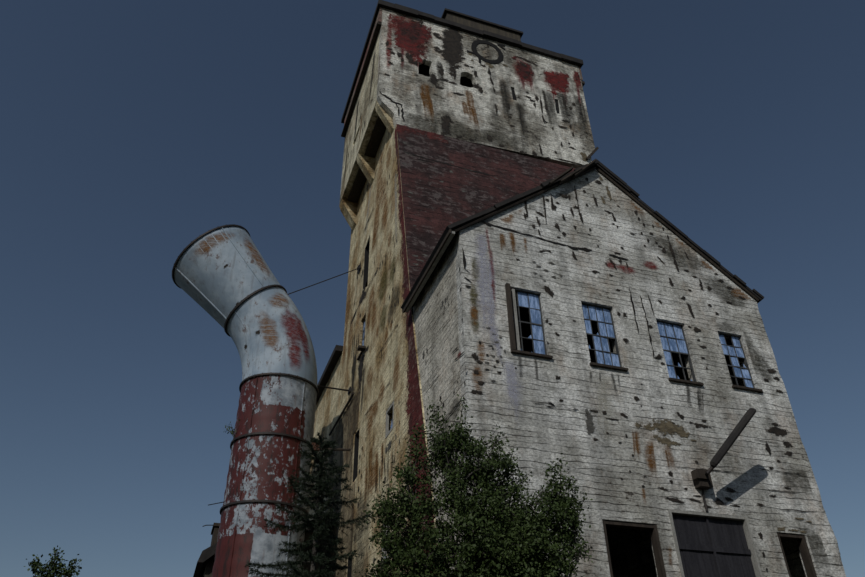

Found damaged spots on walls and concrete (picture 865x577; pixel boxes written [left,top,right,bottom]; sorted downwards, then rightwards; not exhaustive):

flaking render [385,12,587,165]
leakage [500,82,523,125]
leakage [516,60,587,123]
peeling [523,176,620,238]
spalling [532,250,563,297]
peeling [630,210,745,369]
rust [261,296,309,366]
rust [632,433,655,468]